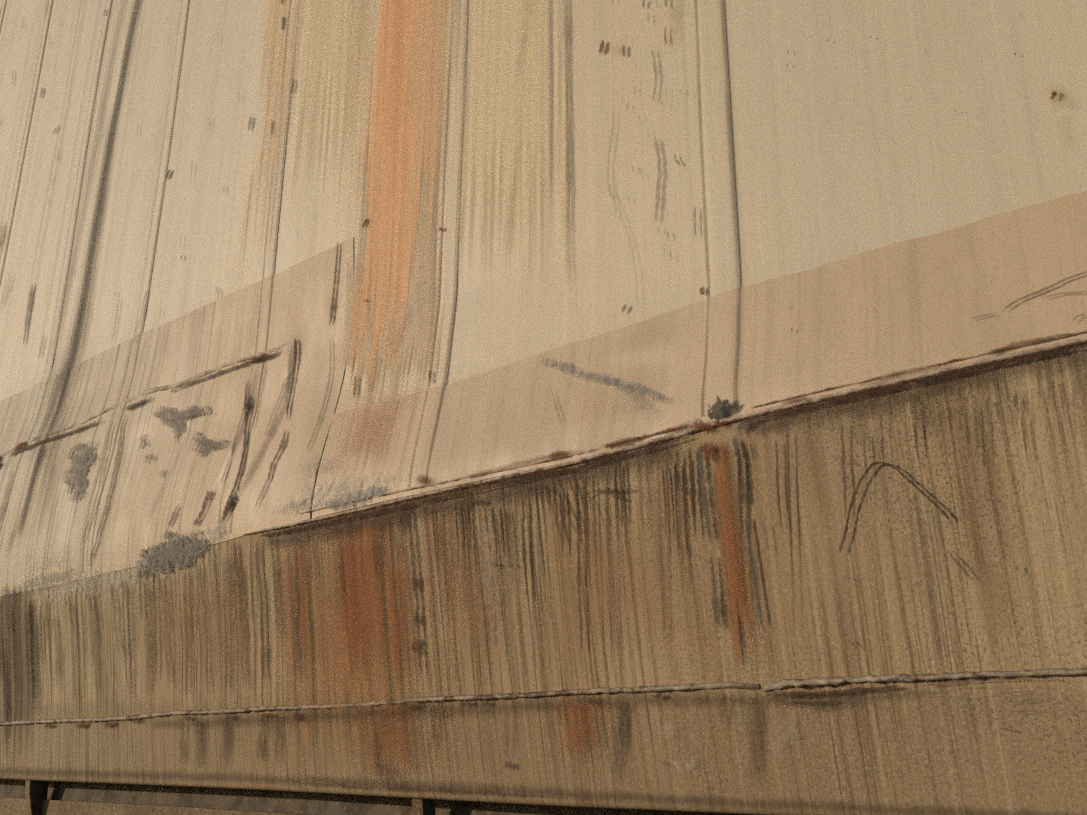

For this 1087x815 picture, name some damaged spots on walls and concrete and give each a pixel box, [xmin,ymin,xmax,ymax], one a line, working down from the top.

rust [349,0,454,396]
damp [455,446,696,649]
rust [666,396,758,662]
damp [737,442,749,528]
damp [776,434,792,555]
rust [737,334,1062,434]